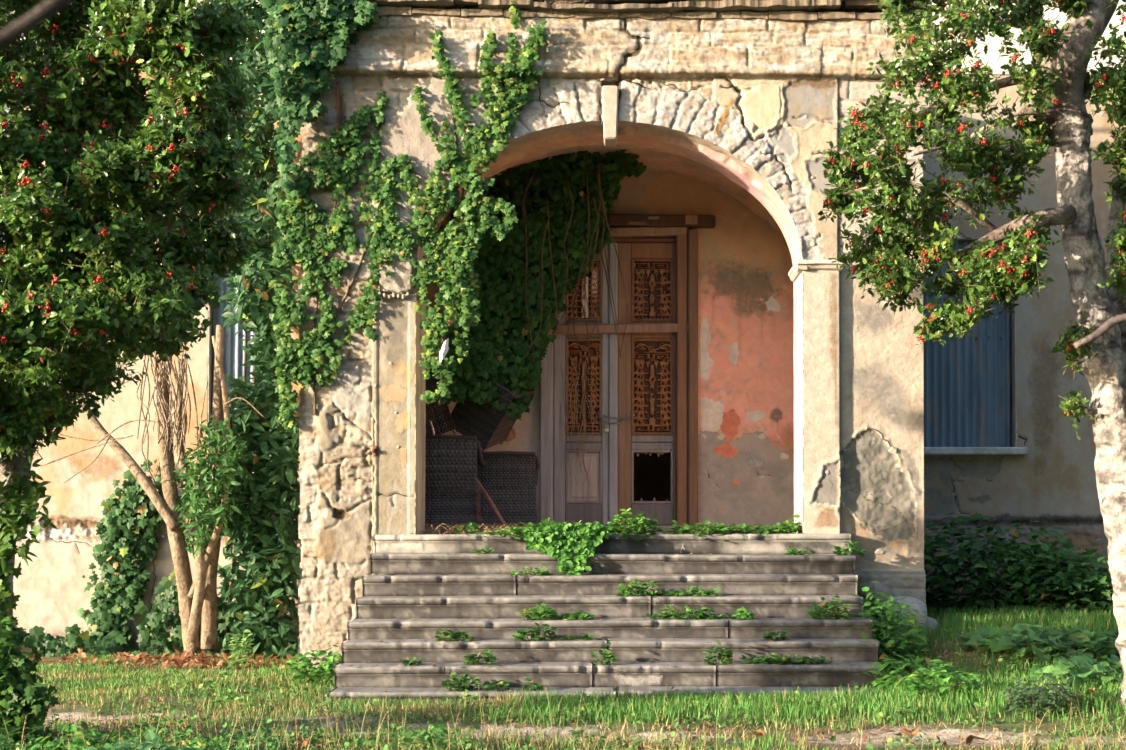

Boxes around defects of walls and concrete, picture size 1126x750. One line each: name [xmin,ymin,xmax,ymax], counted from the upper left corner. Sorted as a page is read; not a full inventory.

crack [532,87,570,108]
crack [599,19,792,191]
flaking render [739,78,838,194]
flaking render [802,237,819,260]
water stain [710,266,772,313]
peeling [759,294,786,312]
peeling [698,316,714,381]
flaking render [698,397,794,531]
flaking render [811,426,1004,562]